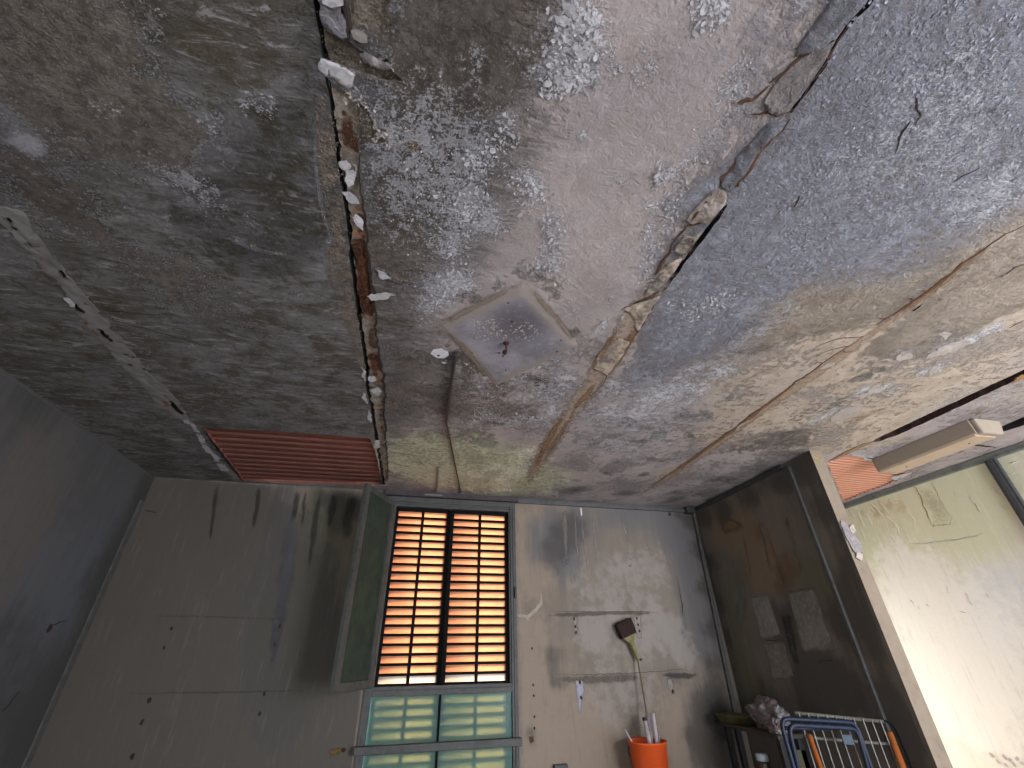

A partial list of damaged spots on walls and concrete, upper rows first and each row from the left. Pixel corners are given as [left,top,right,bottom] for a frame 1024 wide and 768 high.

crack [313,0,414,485]
peeling [298,40,834,441]
crack [581,0,873,407]
crack [675,225,1024,471]